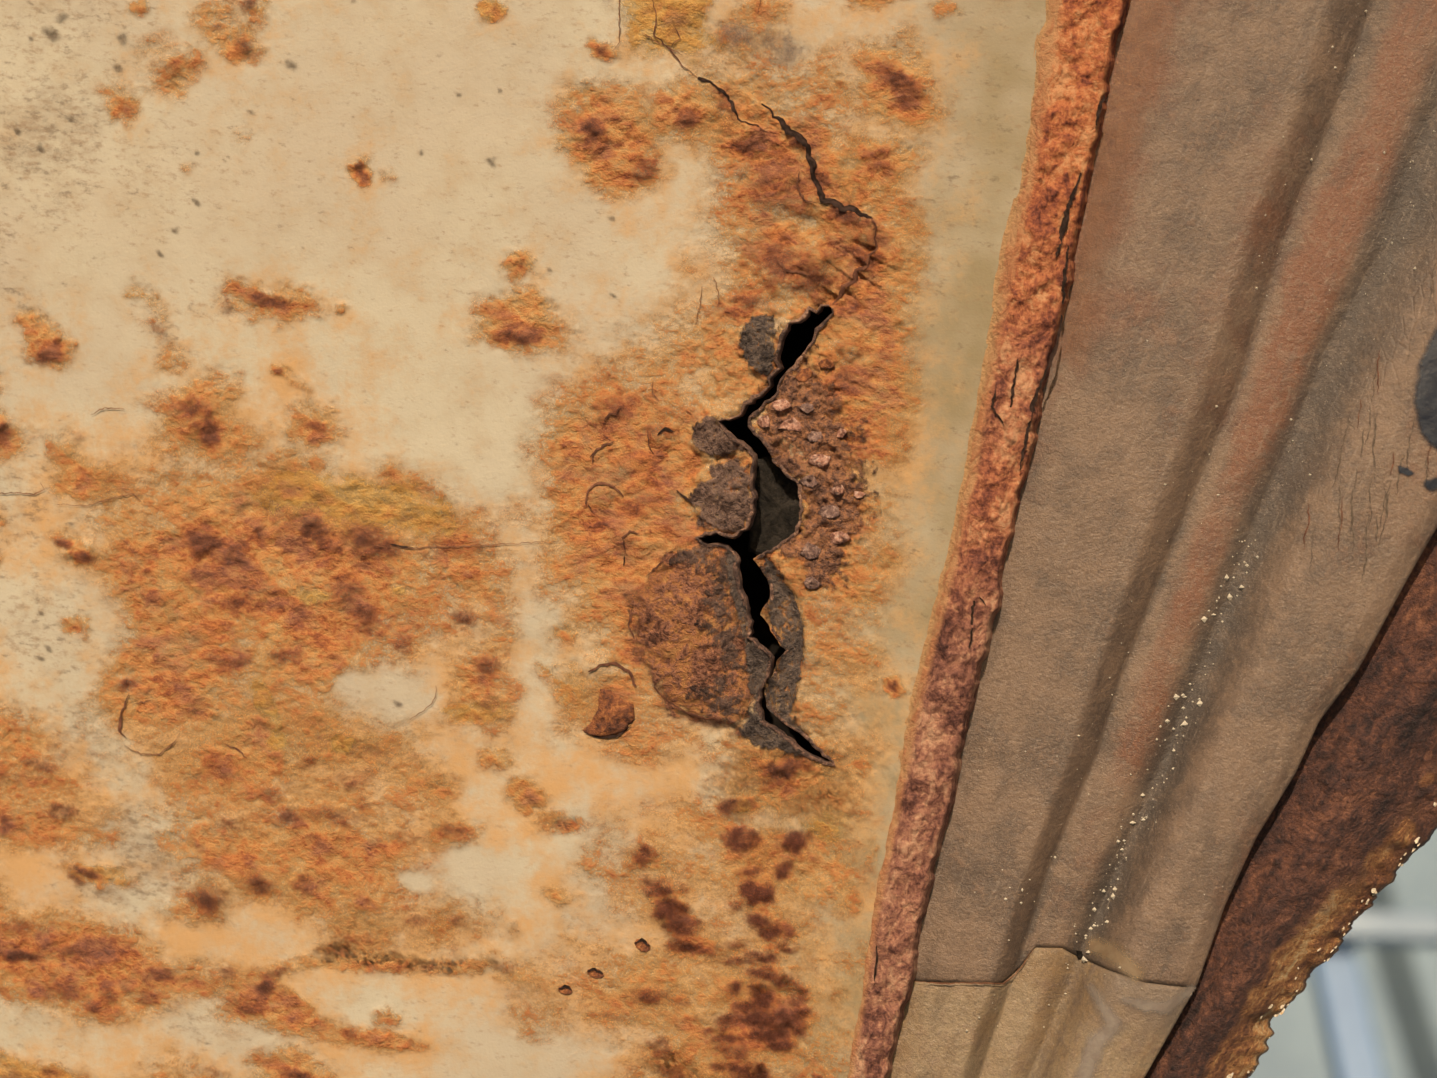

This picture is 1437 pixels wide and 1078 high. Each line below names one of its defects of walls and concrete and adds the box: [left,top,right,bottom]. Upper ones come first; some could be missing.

crack [1096,95,1105,125]
rust [1088,0,1150,230]
crack [585,0,878,766]
crack [990,173,1082,470]
rust [0,0,942,1078]